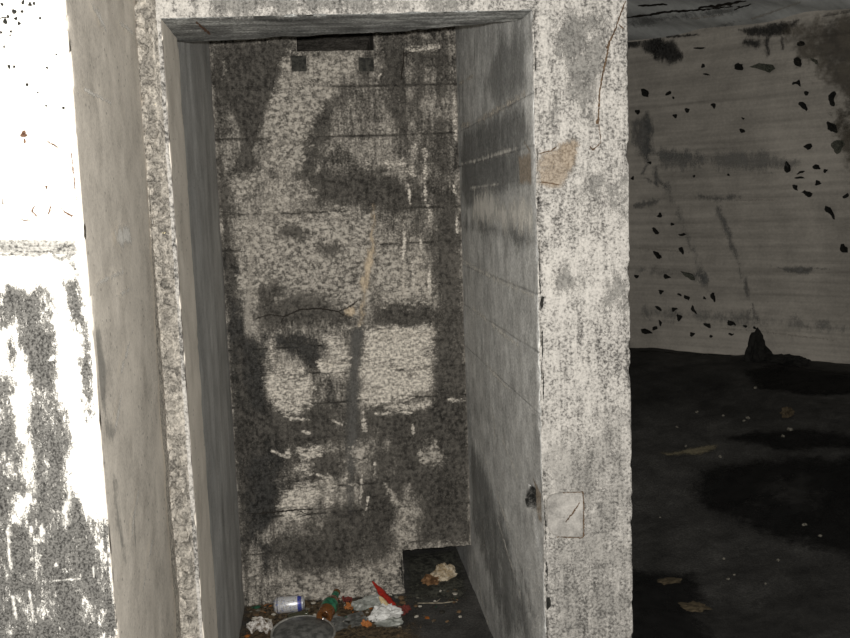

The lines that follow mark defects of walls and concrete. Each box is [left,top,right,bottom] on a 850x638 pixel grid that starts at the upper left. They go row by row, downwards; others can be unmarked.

damp [628,34,697,64]
crack [590,1,751,150]
damp [743,2,850,96]
crack [256,300,358,322]
damp [347,328,364,518]